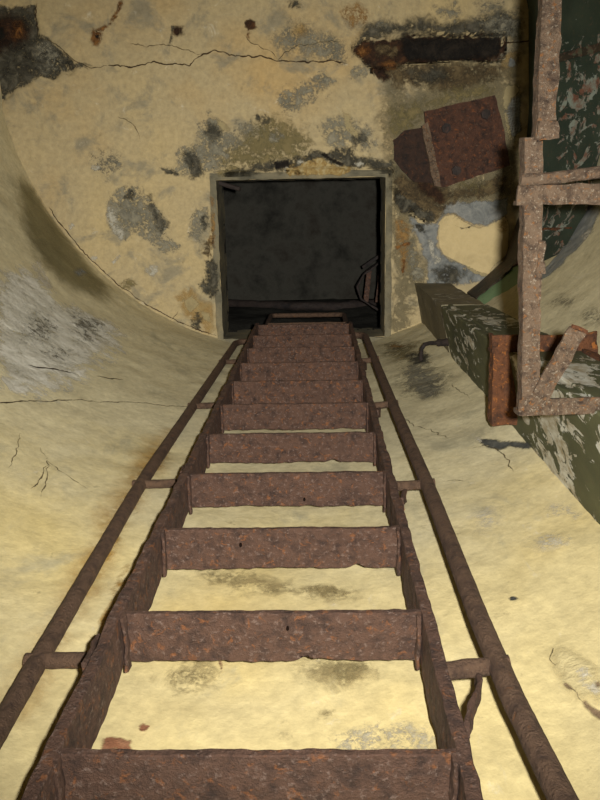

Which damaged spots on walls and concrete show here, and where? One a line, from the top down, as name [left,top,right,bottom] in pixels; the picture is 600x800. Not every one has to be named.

corrosion [91,2,123,45]
crack [35,3,343,69]
water stain [274,24,345,62]
corrosion [375,62,501,90]
water stain [162,61,521,332]
peeling [409,198,509,284]
water stain [0,185,126,399]
water stain [384,342,446,399]
crack [32,448,79,492]
corrosion [102,737,131,749]